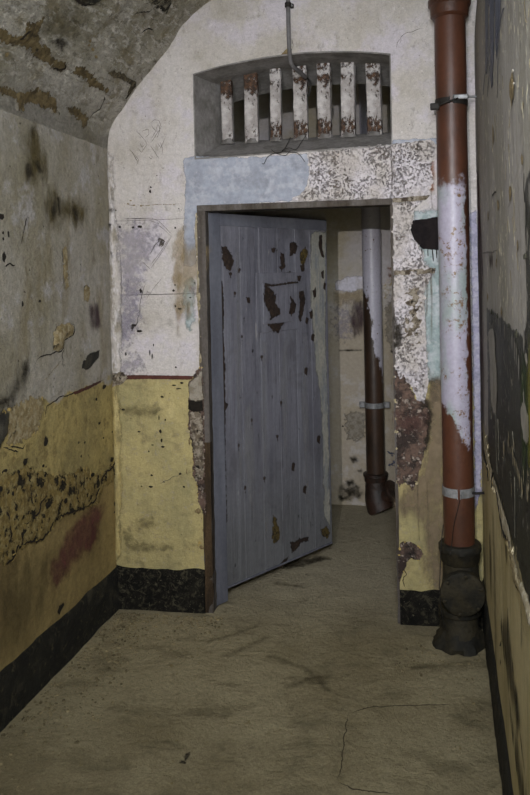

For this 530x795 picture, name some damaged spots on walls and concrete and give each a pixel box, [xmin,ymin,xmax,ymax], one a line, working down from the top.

spalling [0,455,115,567]
spalling [172,336,206,515]
peeling [292,138,437,490]
peeling [485,154,530,626]
crack [338,704,449,794]